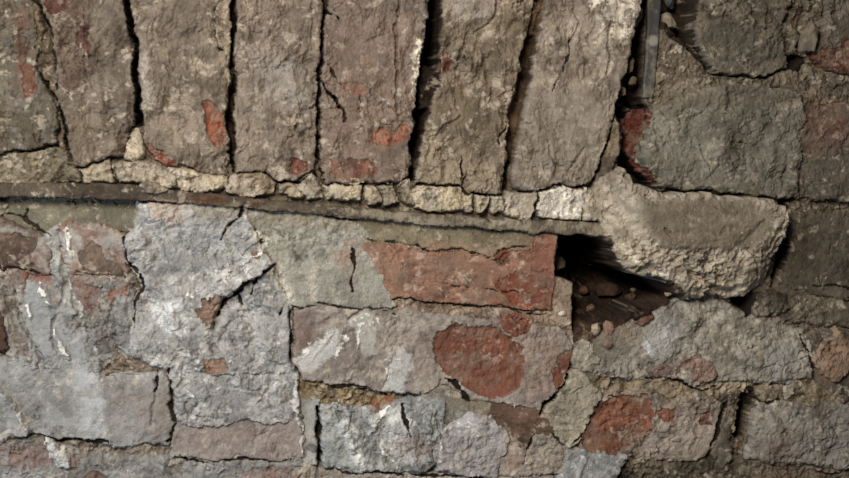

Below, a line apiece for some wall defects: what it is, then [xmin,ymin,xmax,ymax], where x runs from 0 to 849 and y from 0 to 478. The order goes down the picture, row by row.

crack [251,0,614,209]
crack [317,238,547,316]
spalling [379,233,684,478]